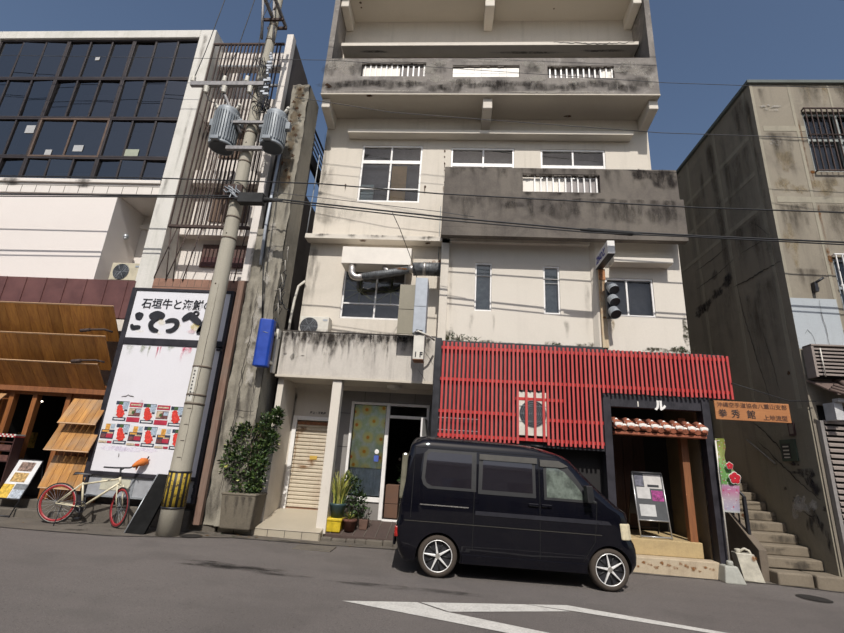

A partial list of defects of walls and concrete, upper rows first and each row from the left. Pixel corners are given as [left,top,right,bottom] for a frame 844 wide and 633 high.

water stain [282,331,414,352]